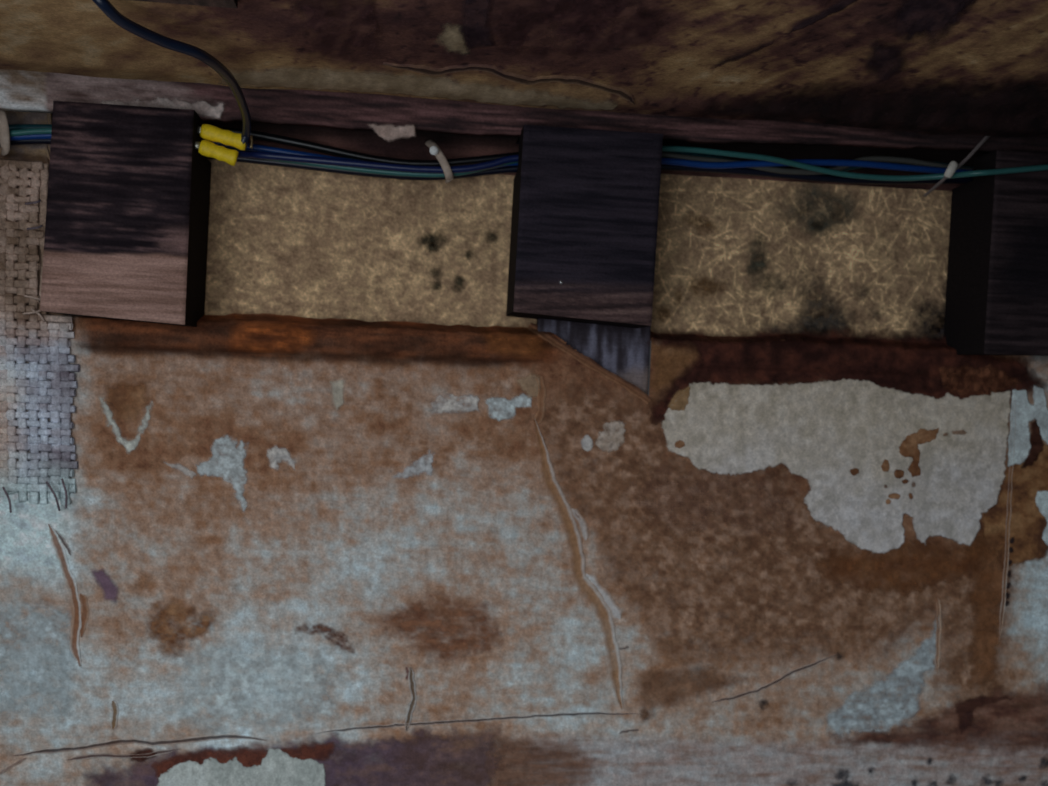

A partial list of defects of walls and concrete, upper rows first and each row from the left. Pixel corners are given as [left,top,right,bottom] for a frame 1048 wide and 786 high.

damp [460,0,660,54]
damp [867,0,976,81]
damp [421,234,445,252]
peeling [432,374,540,421]
peeling [169,436,247,511]
peeling [662,379,1048,553]
rust [983,444,1048,569]
crack [48,524,90,666]
crack [0,701,268,775]
peeling [158,749,325,786]
crack [316,667,645,734]
peeling [828,598,942,734]